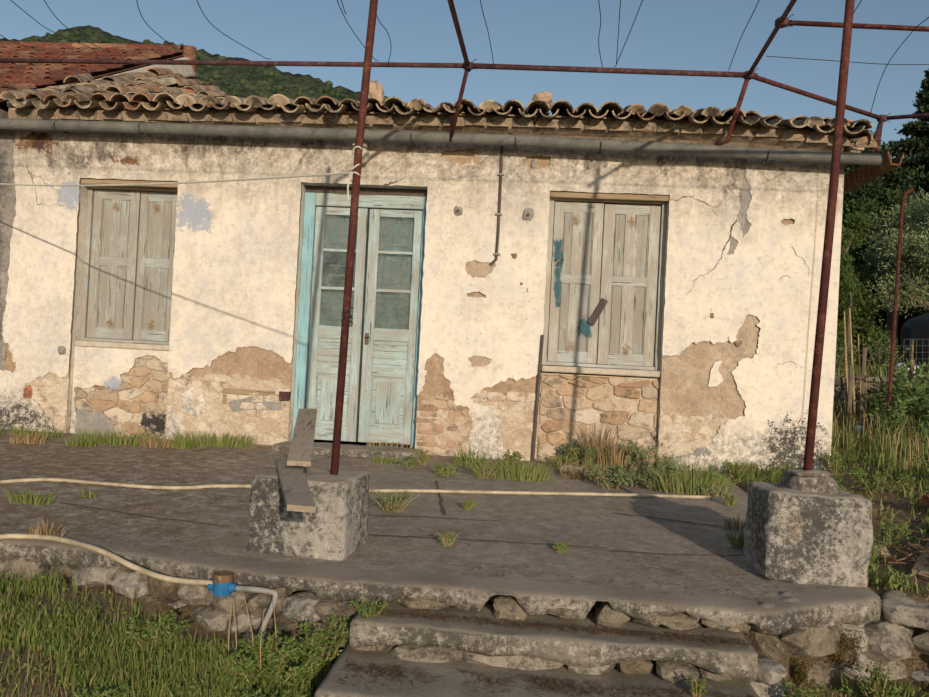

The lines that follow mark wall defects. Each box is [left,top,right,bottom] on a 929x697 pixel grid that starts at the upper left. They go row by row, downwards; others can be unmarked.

spalling [465,260,496,278]
crack [671,196,737,296]
peeling [4,338,16,372]
peeling [23,370,69,433]
peeling [165,344,292,445]
peeling [415,353,540,461]
peeling [657,314,761,467]